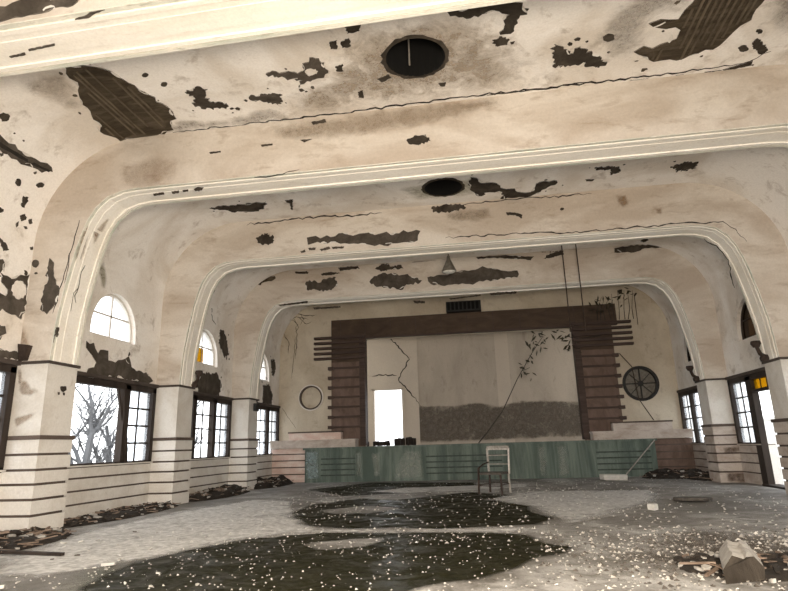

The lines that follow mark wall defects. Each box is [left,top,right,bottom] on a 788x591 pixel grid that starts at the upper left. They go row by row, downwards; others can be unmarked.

spalling [0,0,79,22]
spalling [59,64,176,141]
peeling [185,86,287,113]
peeling [266,57,343,92]
water stain [306,27,501,105]
peeling [550,34,615,69]
spalling [630,0,768,81]
spalling [0,135,53,188]
spalling [300,230,420,253]
peeling [0,238,60,319]
crack [372,339,419,403]
water stain [0,474,654,591]